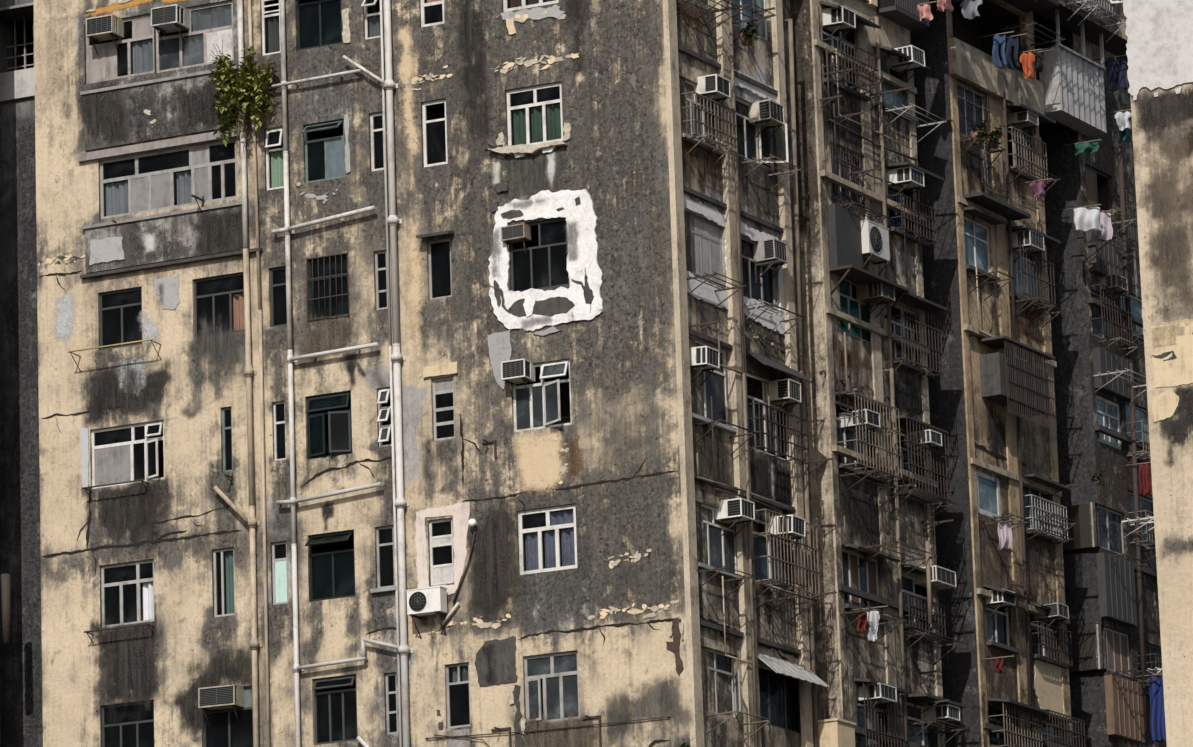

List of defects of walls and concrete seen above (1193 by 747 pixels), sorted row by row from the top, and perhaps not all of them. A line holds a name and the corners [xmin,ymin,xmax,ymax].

flaking render [496,4,566,35]
spalling [490,52,581,74]
flaking render [397,27,453,190]
spalling [491,183,508,213]
peeling [523,294,535,317]
crack [41,406,120,434]
crack [302,457,396,487]
crack [460,415,674,519]
crack [41,488,241,573]
flaking render [605,549,652,569]
crack [517,614,799,660]